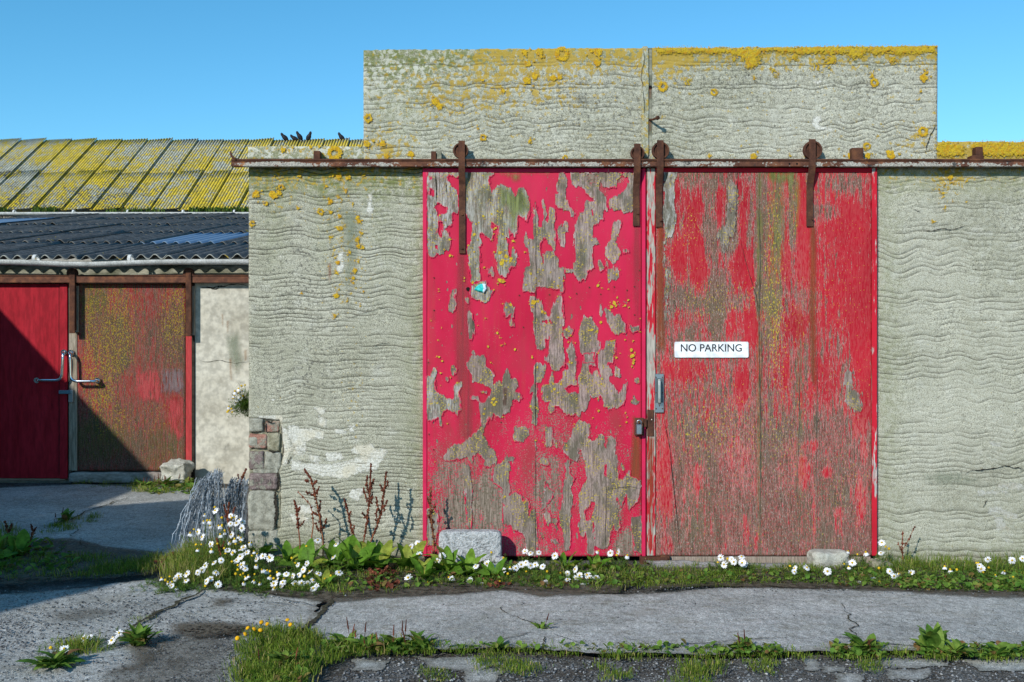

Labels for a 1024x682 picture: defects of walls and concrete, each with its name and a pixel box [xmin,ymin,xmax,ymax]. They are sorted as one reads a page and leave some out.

peeling [716,180,739,253]
peeling [656,172,678,349]
peeling [425,171,642,557]
peeling [842,370,863,416]
crack [123,589,203,663]
crack [238,598,334,631]